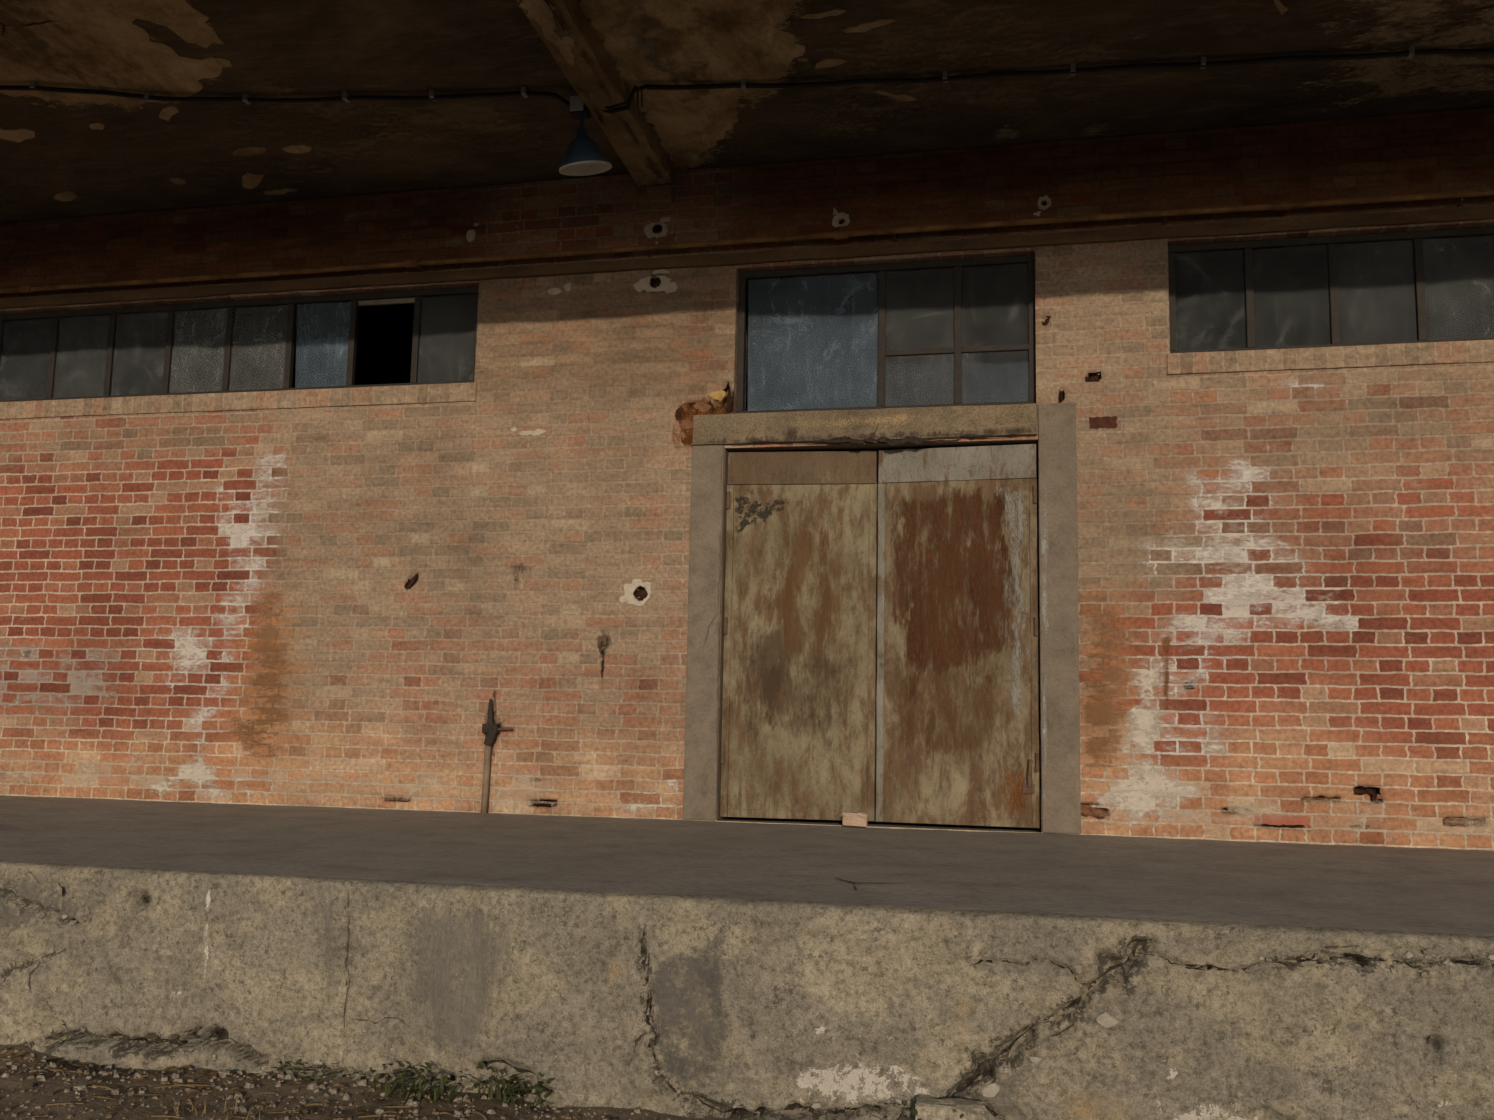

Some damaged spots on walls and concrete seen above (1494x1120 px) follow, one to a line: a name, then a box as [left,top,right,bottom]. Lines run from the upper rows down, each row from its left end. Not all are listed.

peeling [0,0,232,130]
peeling [519,0,575,68]
peeling [579,0,897,171]
damp [0,455,471,805]
rust [751,526,847,731]
rust [892,488,1020,698]
damp [1089,460,1366,827]
damp [1340,805,1450,839]
crack [0,882,85,993]
crack [15,889,552,1101]
crack [629,923,912,1120]
crack [946,933,1494,1120]